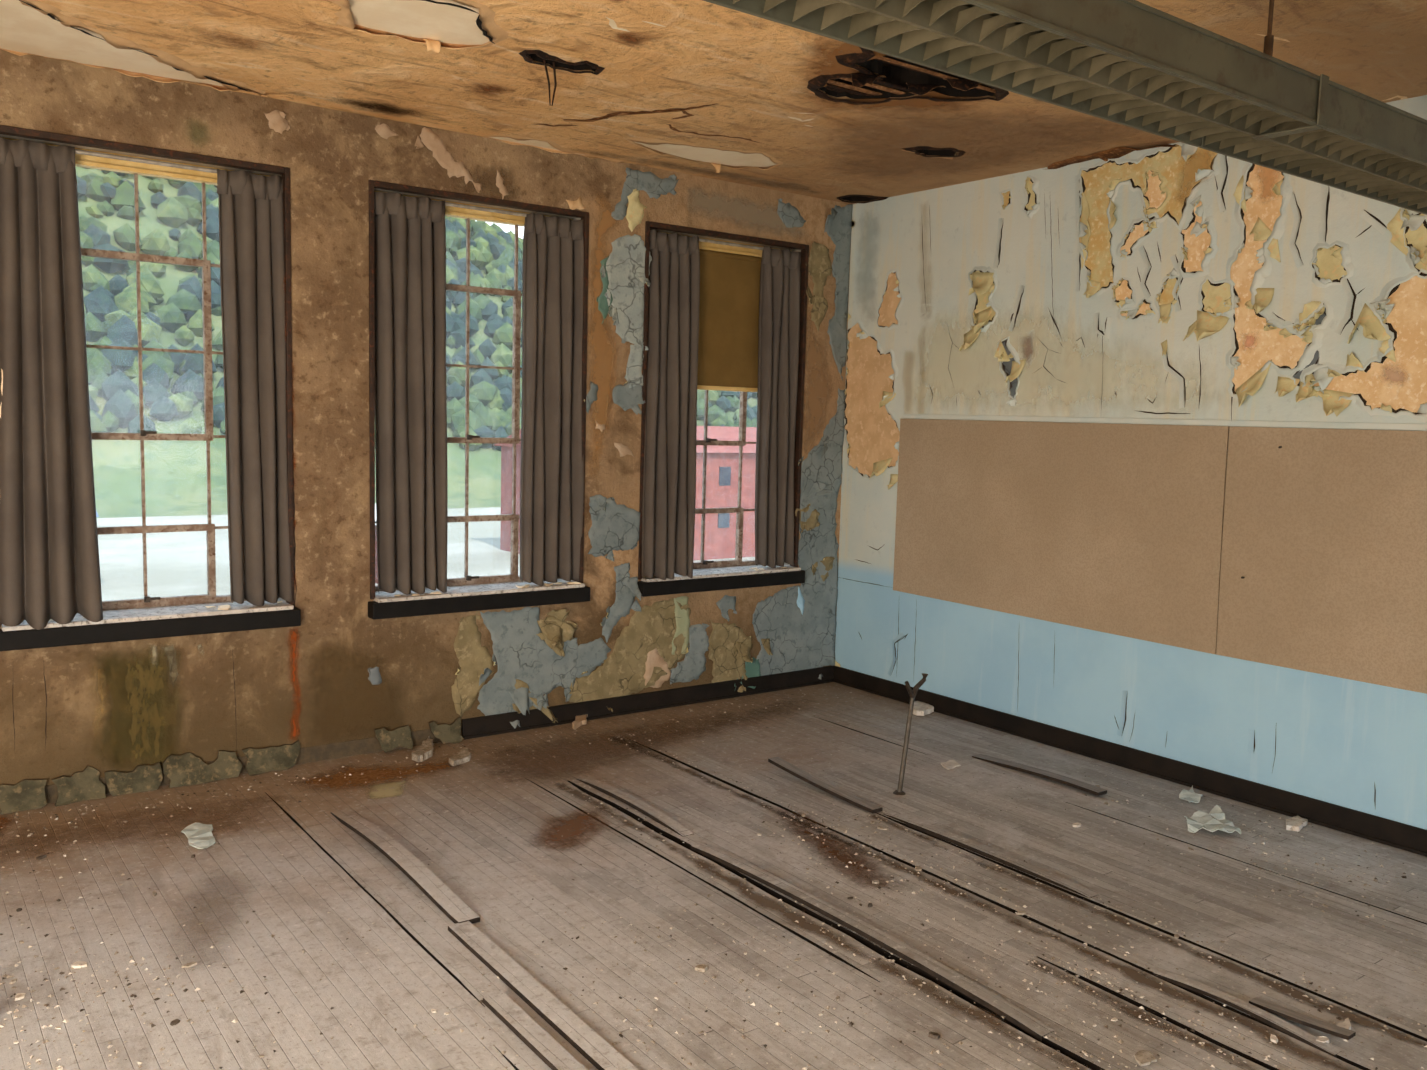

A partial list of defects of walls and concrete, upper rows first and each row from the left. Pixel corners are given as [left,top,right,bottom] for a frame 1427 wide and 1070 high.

peeling [422,38,441,53]
crack [537,104,760,143]
spalling [819,55,995,99]
peeling [1076,142,1427,422]
peeling [451,168,905,729]
damp [96,646,178,765]
rust [289,630,300,739]